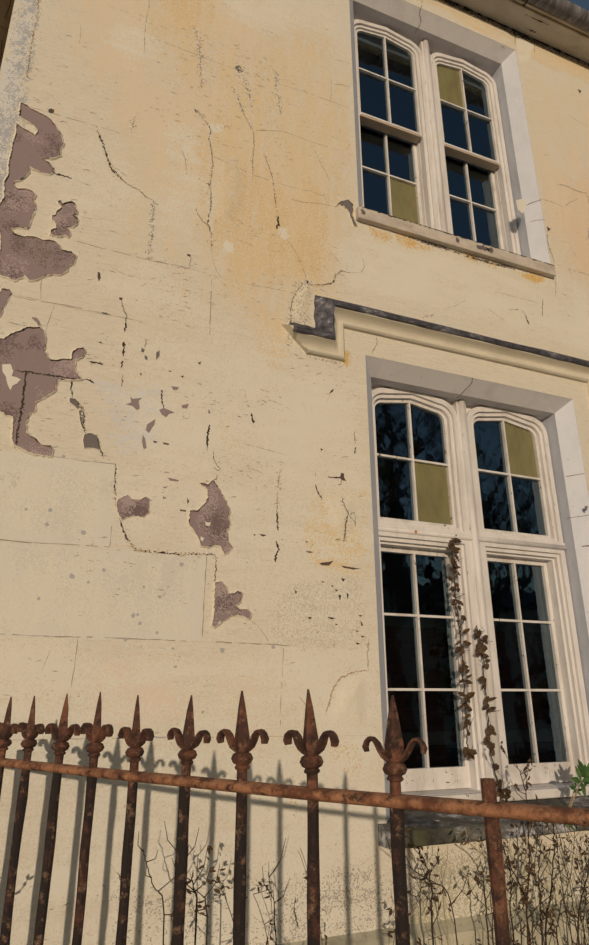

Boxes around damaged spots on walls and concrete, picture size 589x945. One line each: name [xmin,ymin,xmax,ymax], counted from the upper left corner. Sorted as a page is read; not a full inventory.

crack [96,126,155,254]
crack [189,78,365,325]
leakage [37,0,589,396]
spalling [334,199,366,227]
peeling [0,280,395,945]